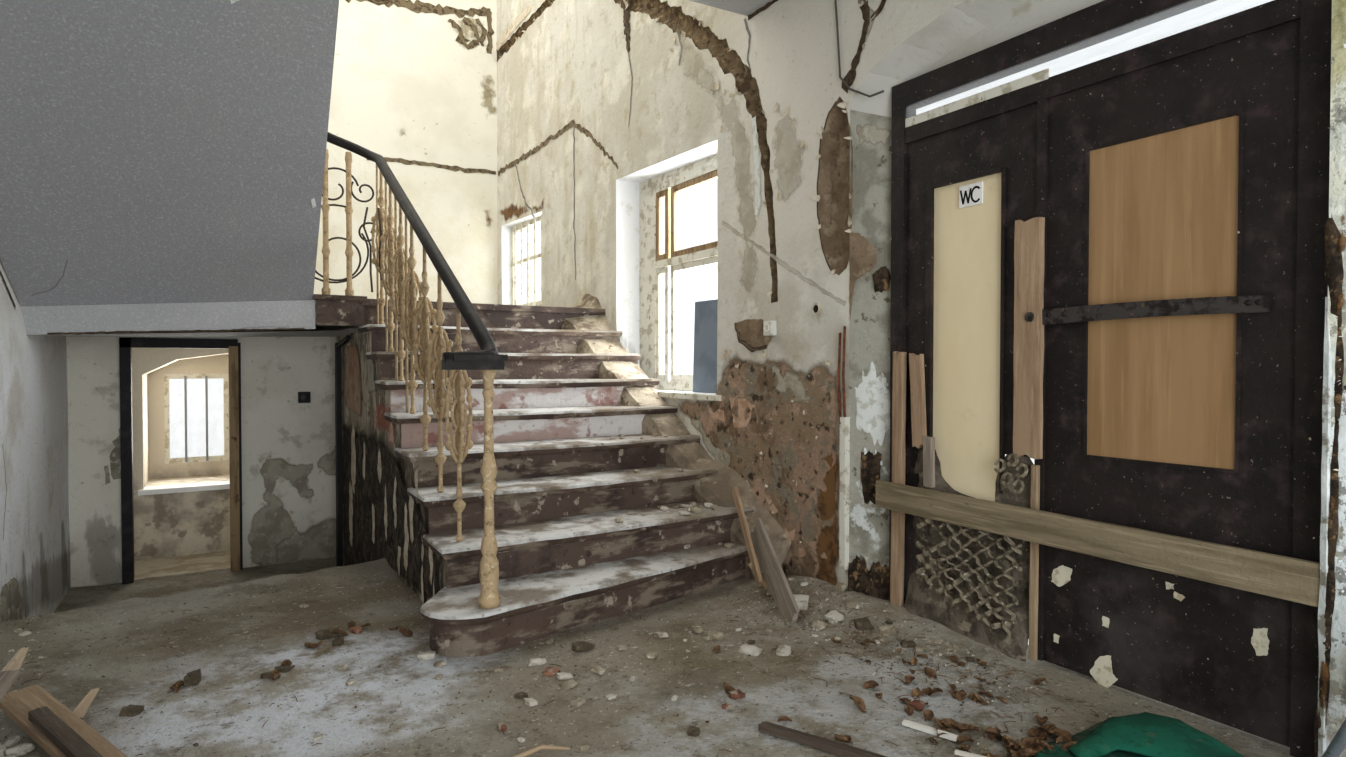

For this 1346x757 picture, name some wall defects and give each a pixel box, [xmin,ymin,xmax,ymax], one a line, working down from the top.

crack [346,0,555,62]
crack [367,119,618,280]
crack [614,0,778,303]
peeling [669,31,756,290]
flaking render [770,0,891,317]
peeling [691,382,771,466]
peeling [725,319,818,439]
flaking render [1314,214,1346,757]